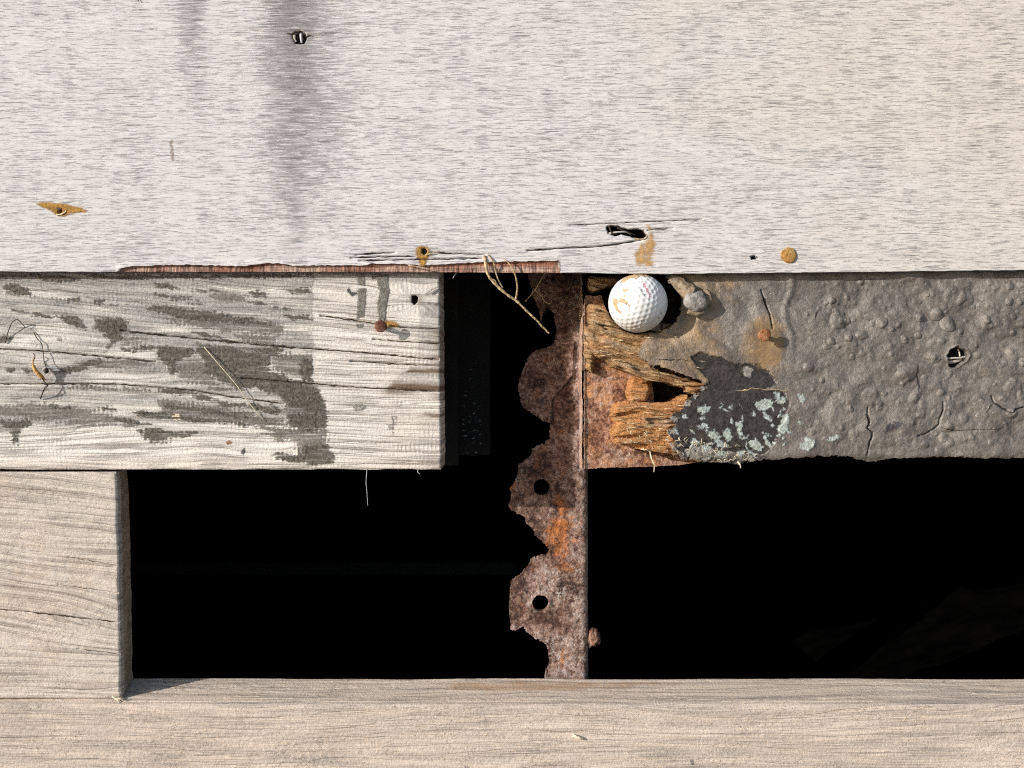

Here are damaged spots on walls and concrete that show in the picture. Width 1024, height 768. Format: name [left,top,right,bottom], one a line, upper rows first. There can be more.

rust [37,202,86,216]
crack [528,219,685,251]
rust [635,226,655,266]
crack [866,408,874,453]
crack [919,397,1023,436]